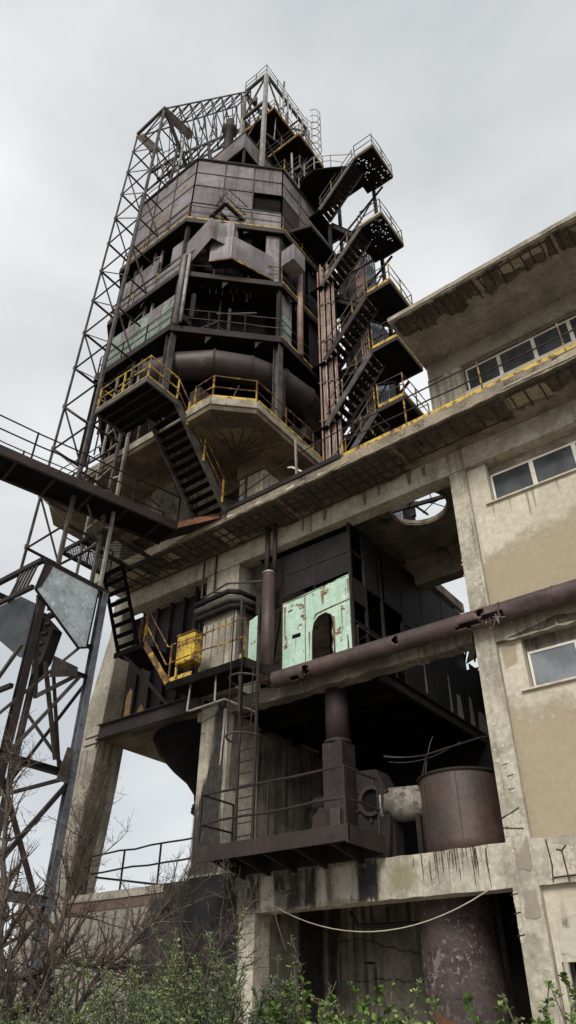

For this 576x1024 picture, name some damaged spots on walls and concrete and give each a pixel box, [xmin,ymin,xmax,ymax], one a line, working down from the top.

spalling [394,224,576,336]
peeling [283,576,350,653]
damp [247,860,378,909]
damp [413,845,489,885]